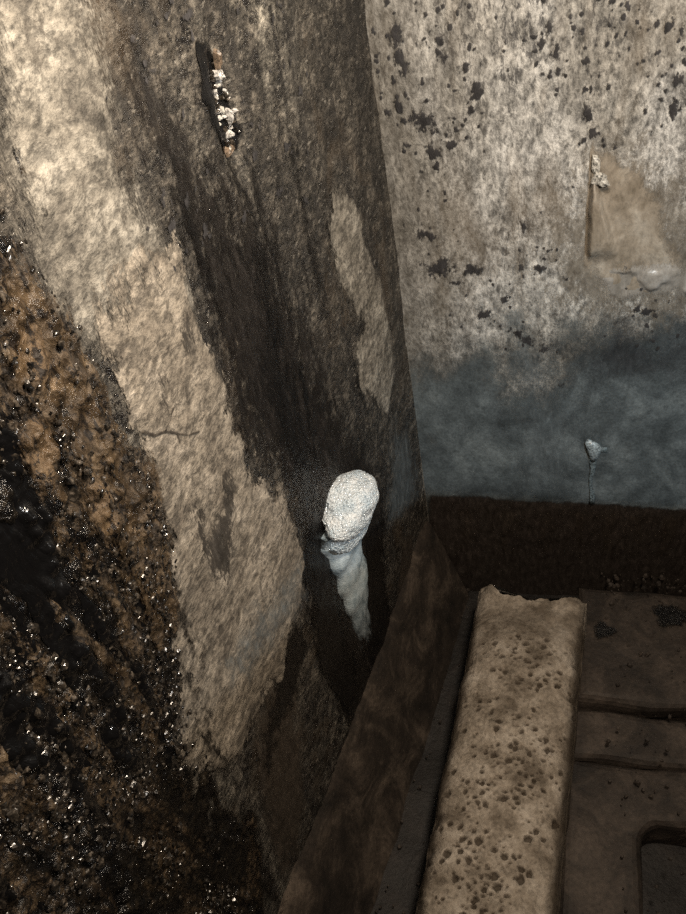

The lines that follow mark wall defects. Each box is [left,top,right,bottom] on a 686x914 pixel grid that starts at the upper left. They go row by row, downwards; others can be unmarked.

damp [372,0,484,175]
damp [523,20,569,79]
damp [577,0,686,150]
damp [417,222,494,297]
damp [518,246,558,278]
peeling [0,0,305,794]
crack [144,407,200,442]
damp [410,263,686,517]
damp [168,131,391,913]